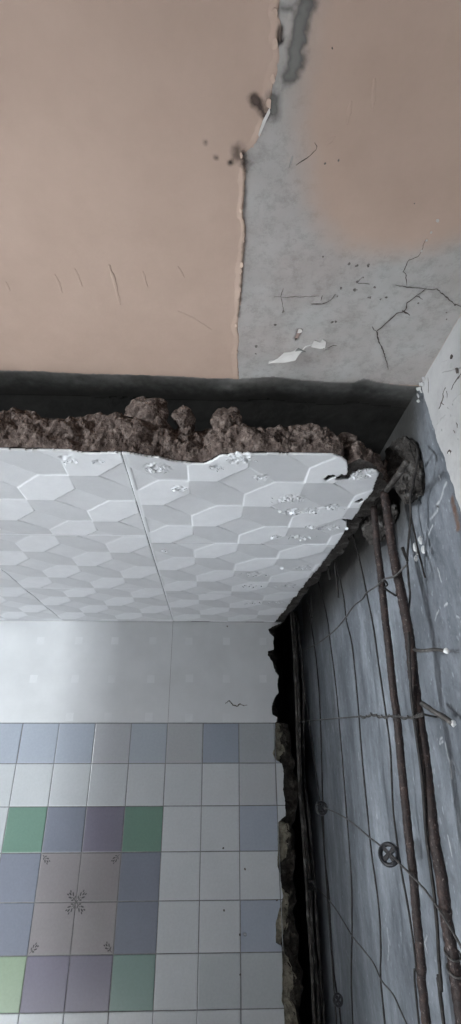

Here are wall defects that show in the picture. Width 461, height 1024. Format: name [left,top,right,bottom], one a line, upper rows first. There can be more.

peeling [231,0,461,403]
crack [372,240,461,367]
spalling [268,623,304,1024]